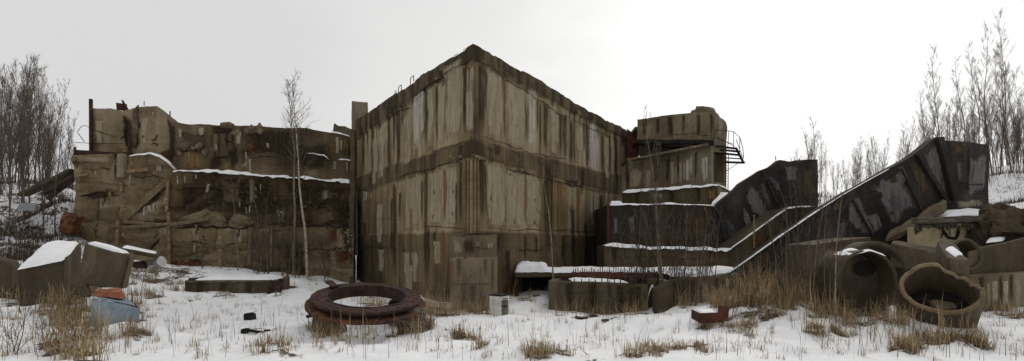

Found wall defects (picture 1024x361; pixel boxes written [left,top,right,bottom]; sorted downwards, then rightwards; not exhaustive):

crack [81,116,281,238]
spalling [231,122,266,136]
crack [122,61,623,276]
leakage [177,61,707,289]